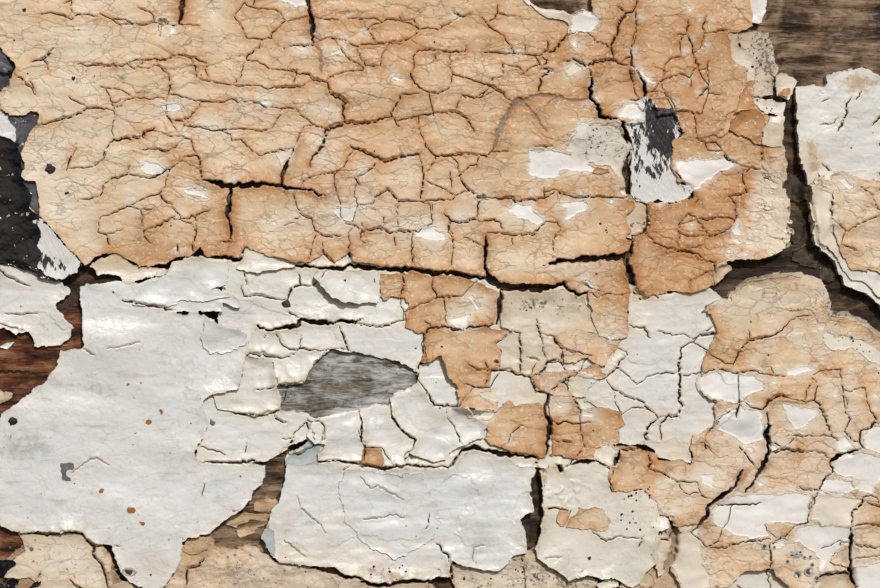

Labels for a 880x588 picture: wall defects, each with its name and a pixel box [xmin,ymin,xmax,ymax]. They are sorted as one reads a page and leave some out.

crack [14,49,53,95]
crack [751,76,784,102]
peeling [728,0,880,145]
spalling [808,170,854,249]
crack [38,0,773,543]
crack [592,315,880,588]
crack [344,514,484,588]